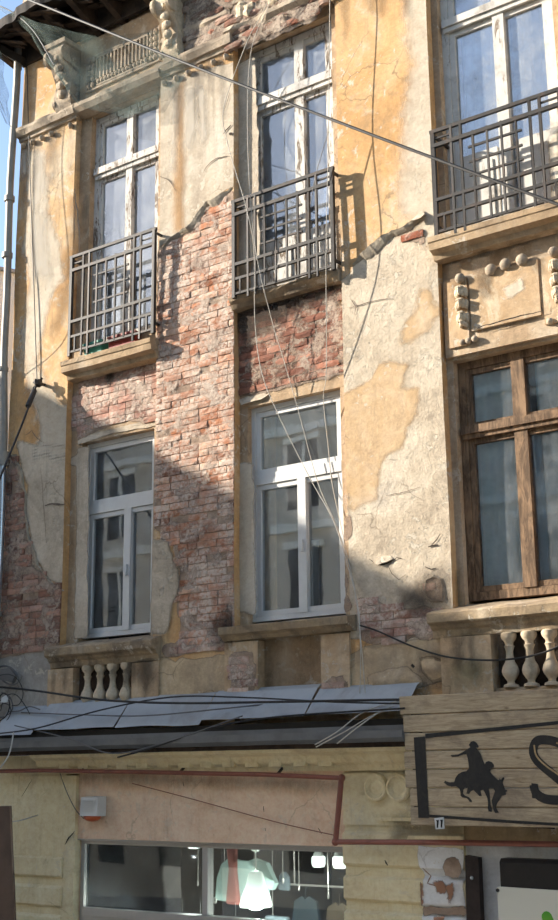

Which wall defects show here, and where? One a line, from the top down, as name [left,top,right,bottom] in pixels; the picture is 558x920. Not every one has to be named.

flaking render [550,127,558,196]
flaking render [504,278,524,297]
flaking render [0,0,453,695]
flaking render [417,846,466,920]